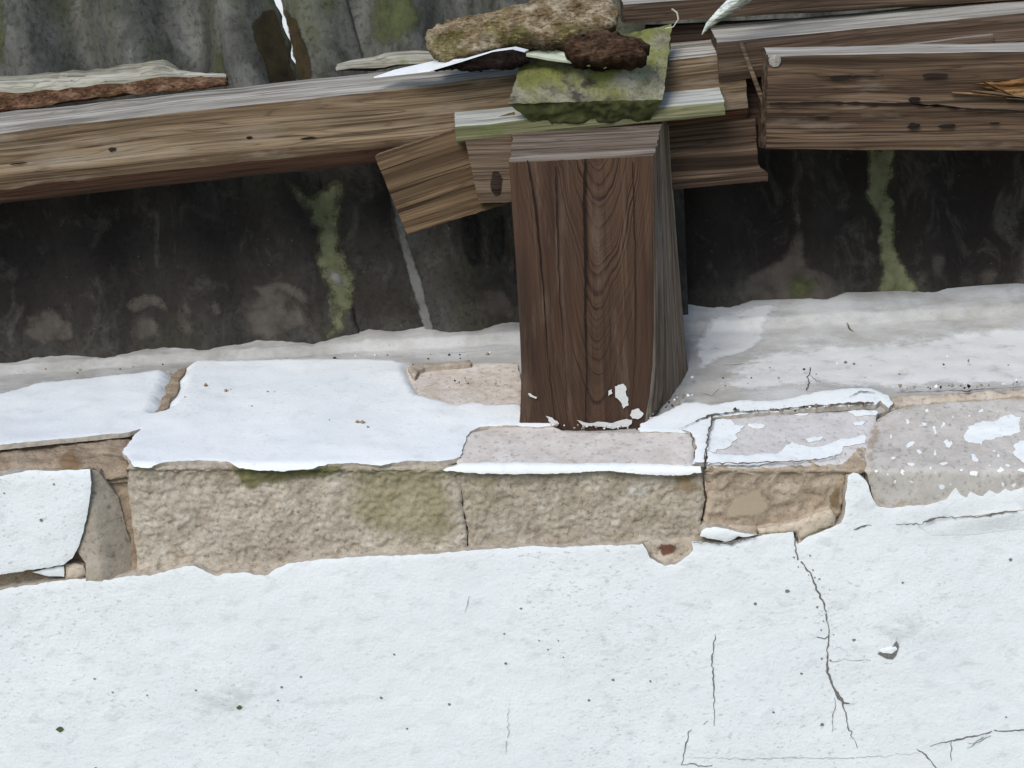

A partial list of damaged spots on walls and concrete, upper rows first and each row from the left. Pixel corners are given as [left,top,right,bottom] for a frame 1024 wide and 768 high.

damp [26,311,72,343]
damp [129,295,166,340]
damp [247,282,306,339]
peeling [407,360,537,406]
spalling [0,384,1024,581]
spalling [0,570,46,584]
crack [681,532,1024,768]